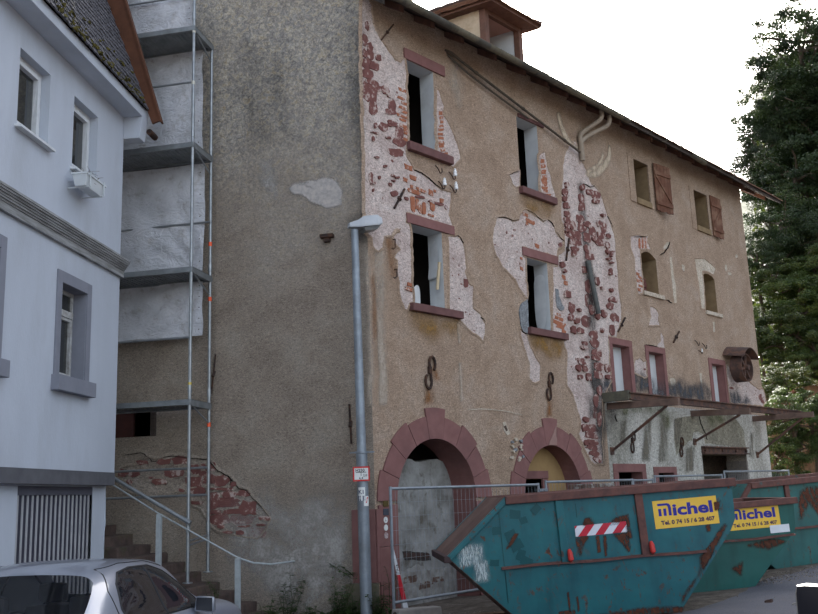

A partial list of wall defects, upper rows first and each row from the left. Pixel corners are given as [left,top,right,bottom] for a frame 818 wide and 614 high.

flaking render [358,0,487,344]
flaking render [490,139,623,467]
flaking render [629,233,652,296]
flaking render [648,304,665,348]
flaking render [662,241,731,311]
flaking render [633,355,648,380]
leakage [590,359,613,464]
leakage [643,421,651,460]
leakage [649,407,682,462]
leakage [686,447,694,471]
flaking render [117,452,273,540]